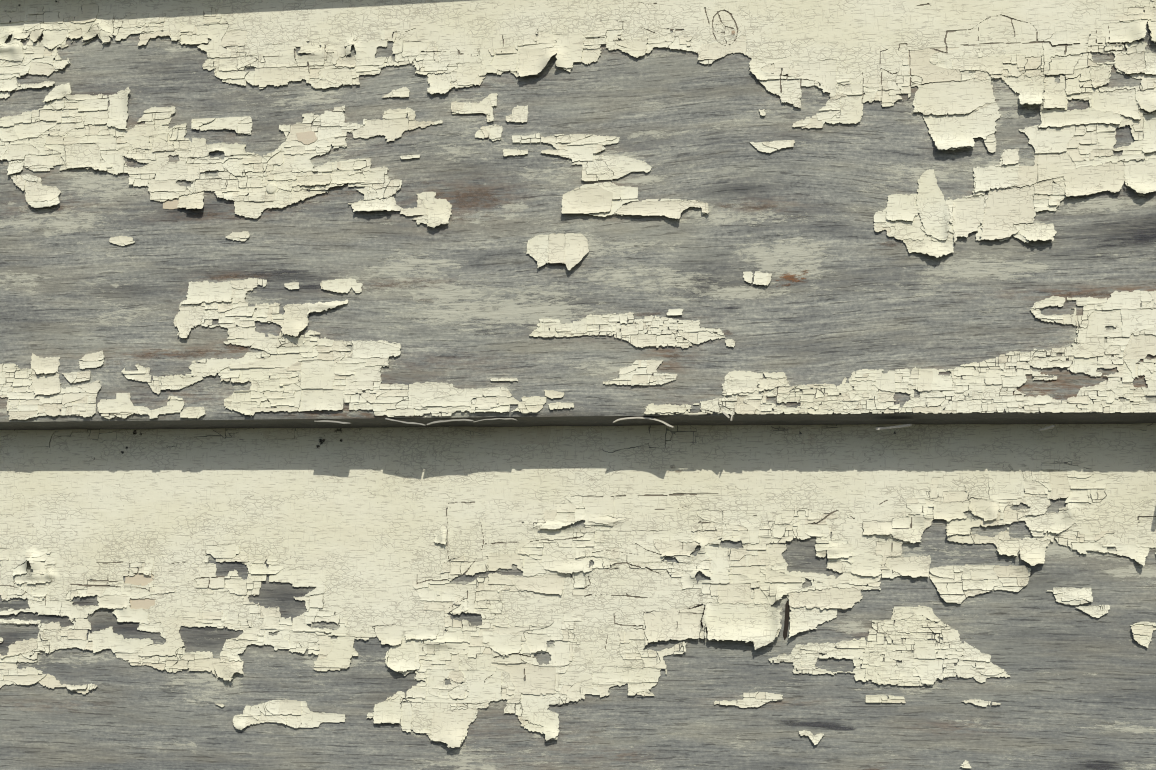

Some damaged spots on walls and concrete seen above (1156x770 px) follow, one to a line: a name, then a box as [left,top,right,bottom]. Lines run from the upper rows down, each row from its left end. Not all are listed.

peeling [0,0,1156,258]
peeling [526,233,589,270]
peeling [0,278,1156,455]
peeling [743,271,772,286]
peeling [0,461,1156,748]
crack [782,600,790,640]